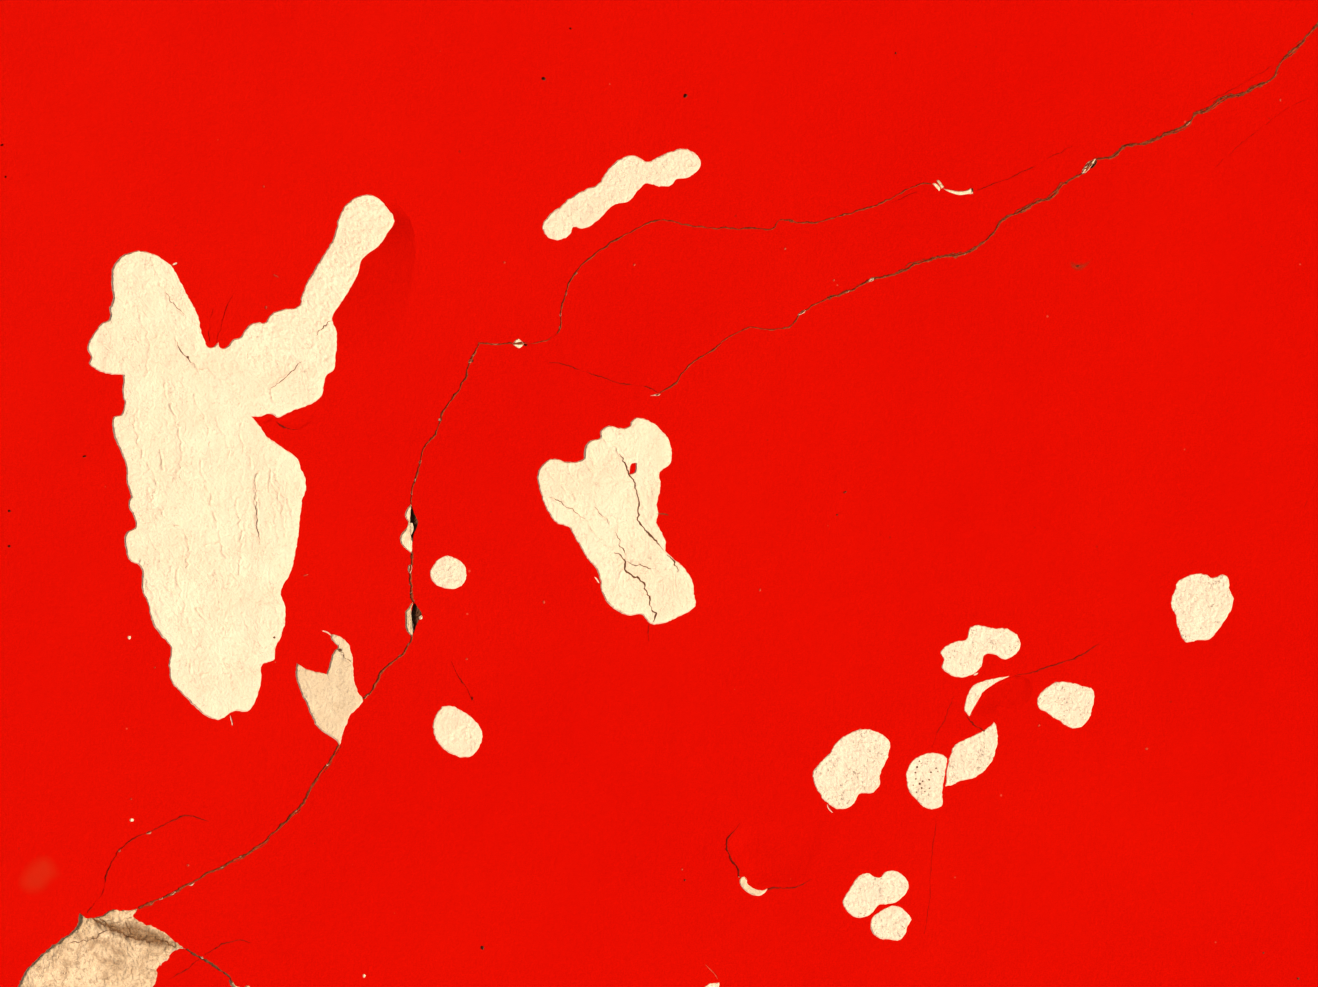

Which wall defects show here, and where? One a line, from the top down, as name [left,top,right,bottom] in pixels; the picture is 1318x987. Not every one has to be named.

peeling [542,149,701,240]
crack [363,21,1318,699]
peeling [87,195,394,725]
peeling [537,418,696,625]
peeling [1171,574,1234,642]
crack [933,696,985,744]
peeling [813,729,890,813]
crack [87,815,206,913]
crack [138,745,341,909]
crack [725,826,811,890]
flaking render [18,908,185,987]
crack [172,940,250,984]